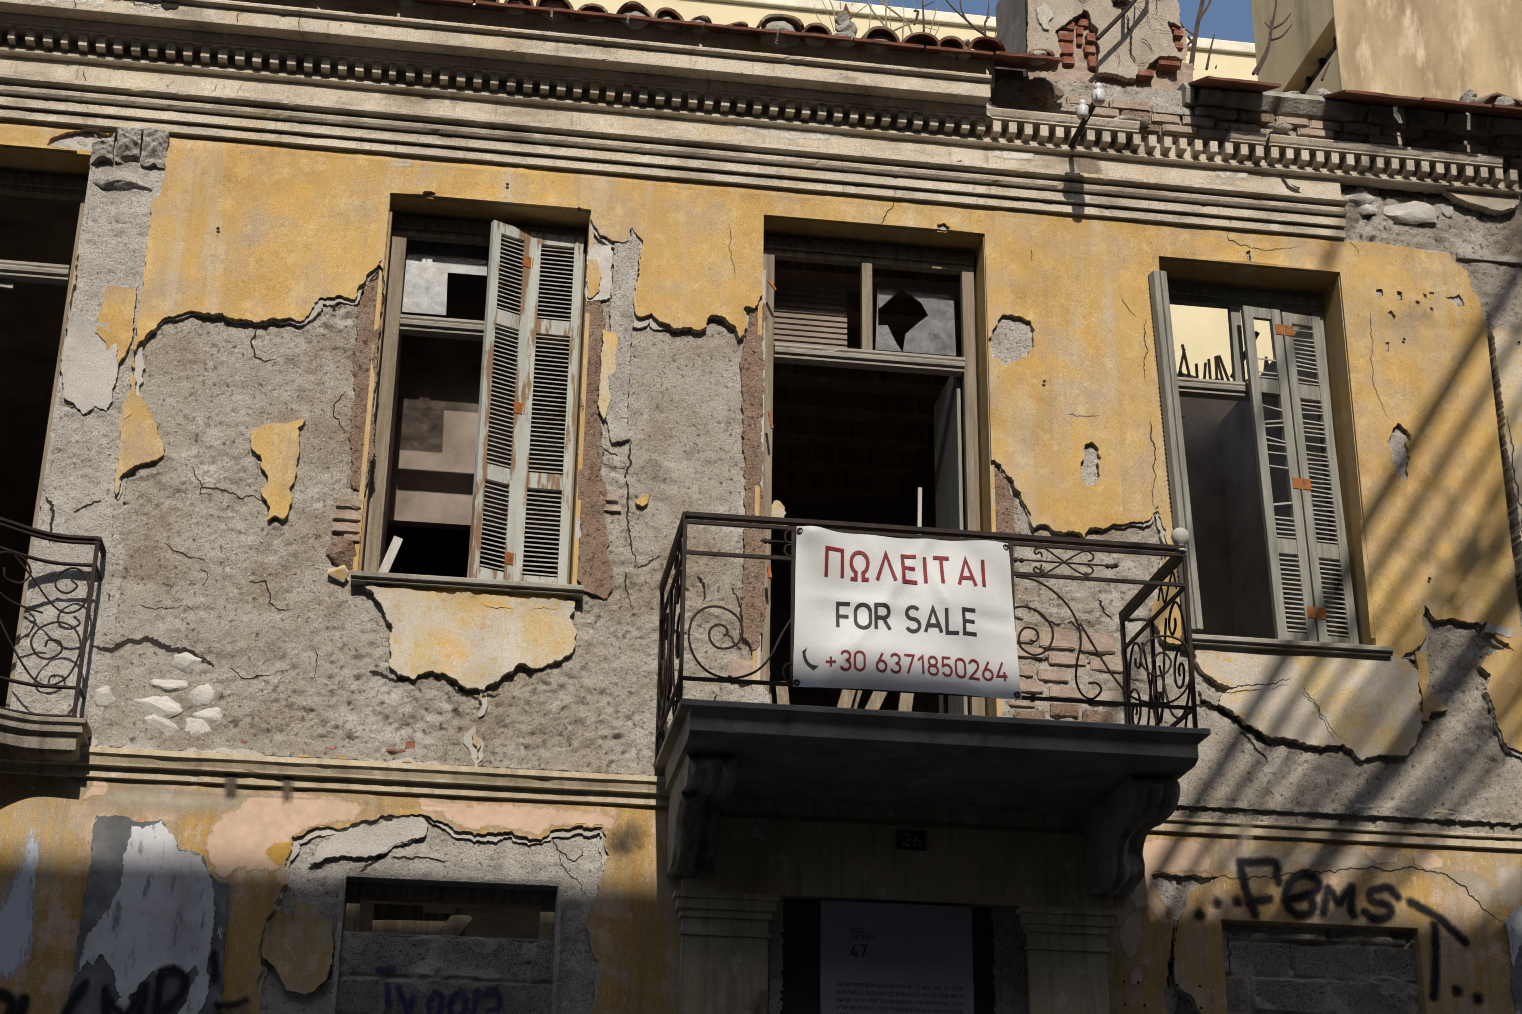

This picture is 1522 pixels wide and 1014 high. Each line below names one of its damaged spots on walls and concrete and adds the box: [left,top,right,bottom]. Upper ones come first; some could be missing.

spalling [1037,3,1424,147]
spalling [1340,137,1522,345]
spalling [991,317,1033,366]
spalling [14,132,770,776]
spalling [1080,444,1100,487]
spalling [1388,426,1409,482]
crack [1507,416,1522,532]
spalling [994,466,1522,1014]
spalling [205,792,616,1014]